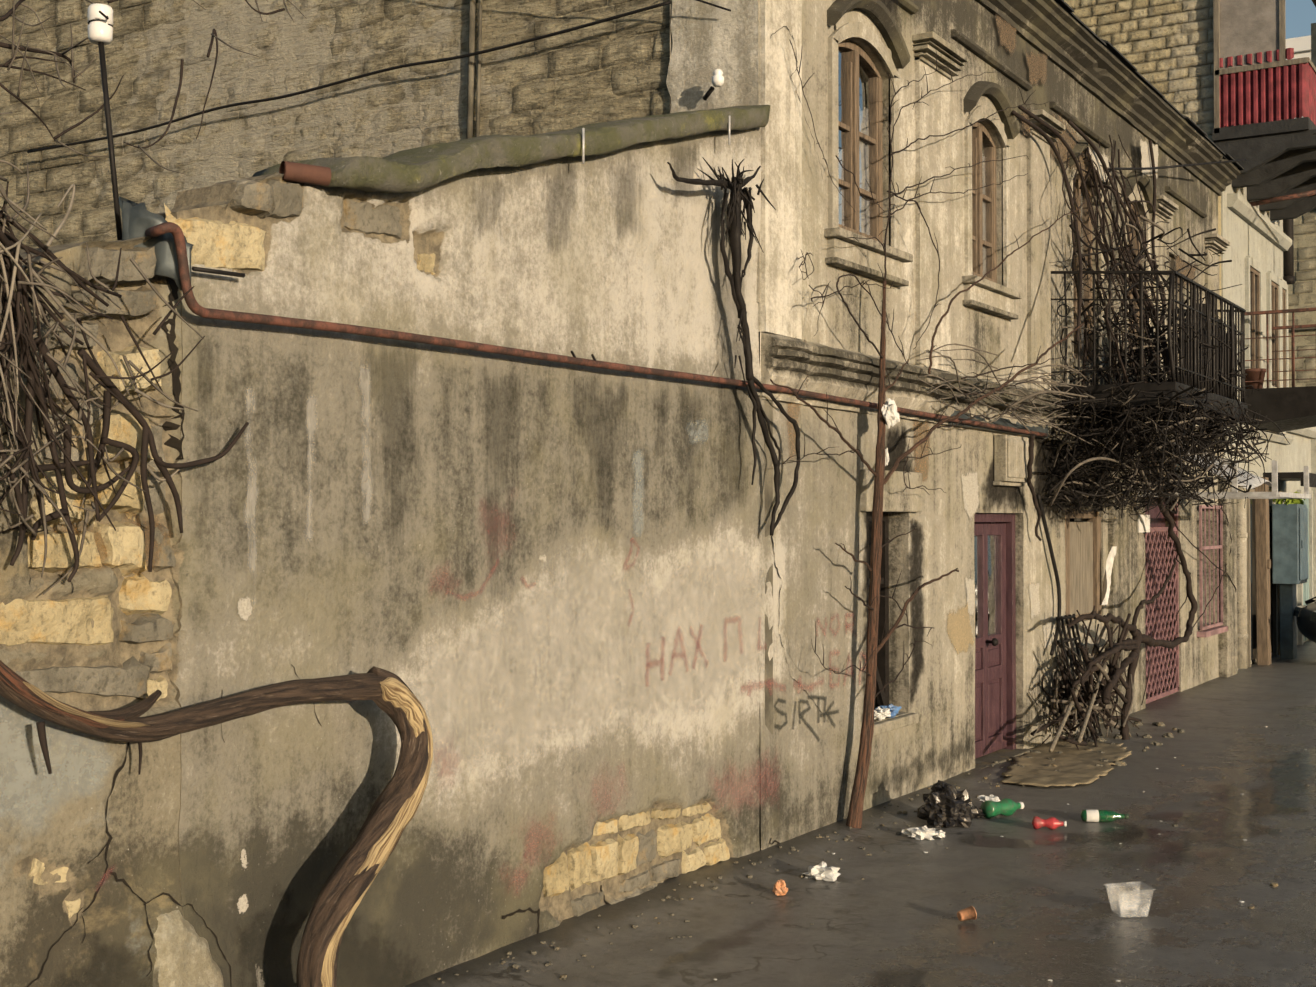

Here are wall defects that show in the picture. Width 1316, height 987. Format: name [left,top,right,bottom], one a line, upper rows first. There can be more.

flaking render [164,178,303,271]
flaking render [343,198,402,239]
damp [245,433,257,572]
damp [307,397,315,474]
damp [360,368,371,522]
damp [909,520,924,702]
crack [27,742,232,987]
flaking render [542,801,730,917]